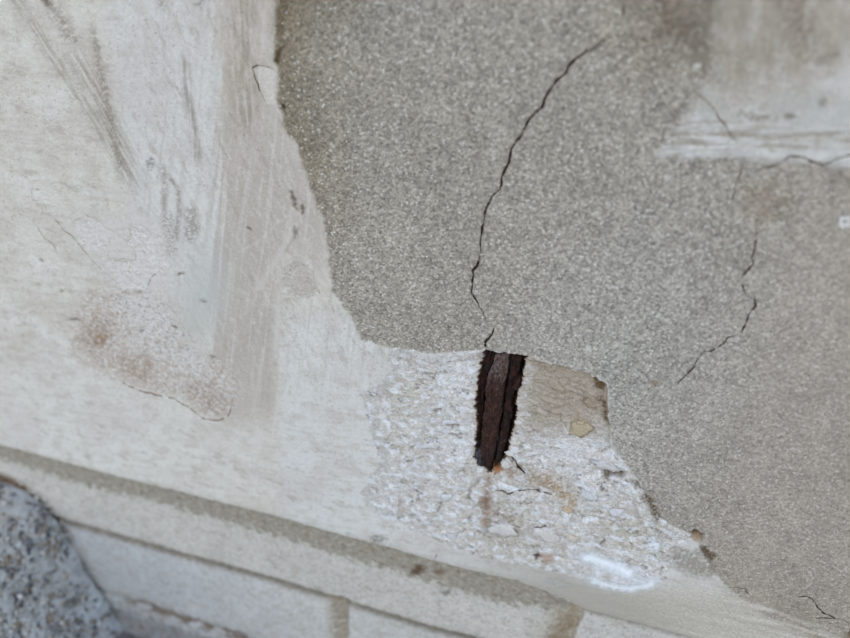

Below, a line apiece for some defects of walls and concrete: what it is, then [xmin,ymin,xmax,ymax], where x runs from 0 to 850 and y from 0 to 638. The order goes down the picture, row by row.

crack [471,0,655,348]
crack [697,93,736,141]
crack [732,155,849,198]
flaking render [68,285,240,423]
corrosion [474,350,524,474]
spalling [360,348,691,585]
crack [675,217,768,386]